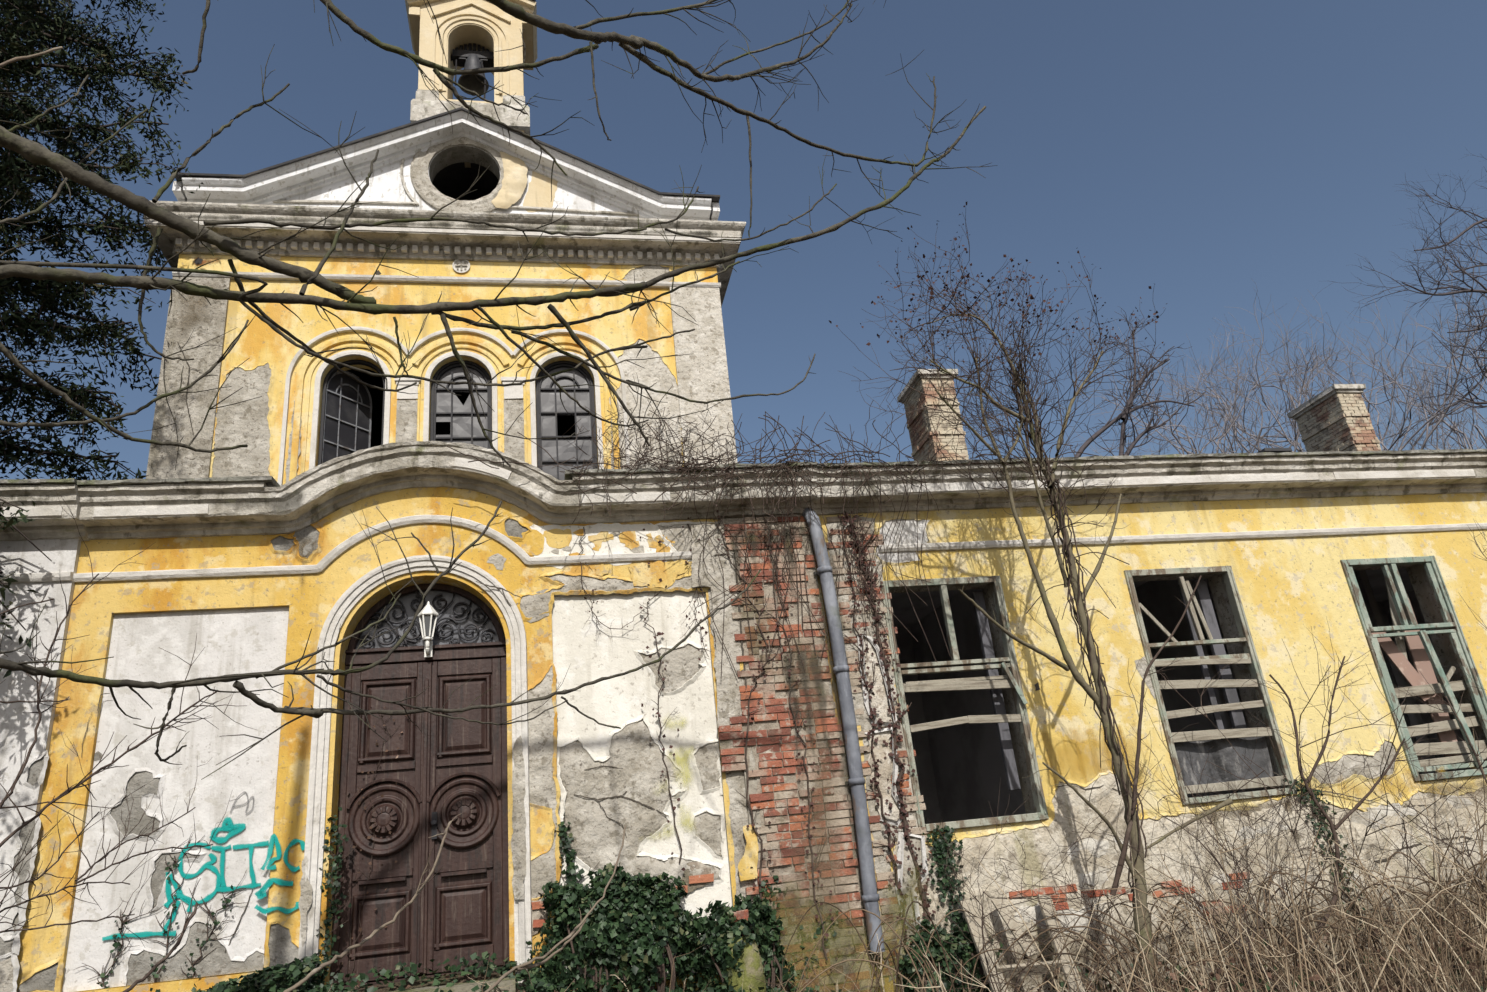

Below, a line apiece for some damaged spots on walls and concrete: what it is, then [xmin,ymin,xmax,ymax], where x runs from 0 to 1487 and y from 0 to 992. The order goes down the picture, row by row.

peeling [620,265,676,282]
peeling [210,362,301,483]
peeling [606,337,684,469]
peeling [23,750,49,790]
flaking render [487,514,1487,992]
peeling [0,815,64,992]
peeling [107,767,206,915]
peeling [122,856,312,986]